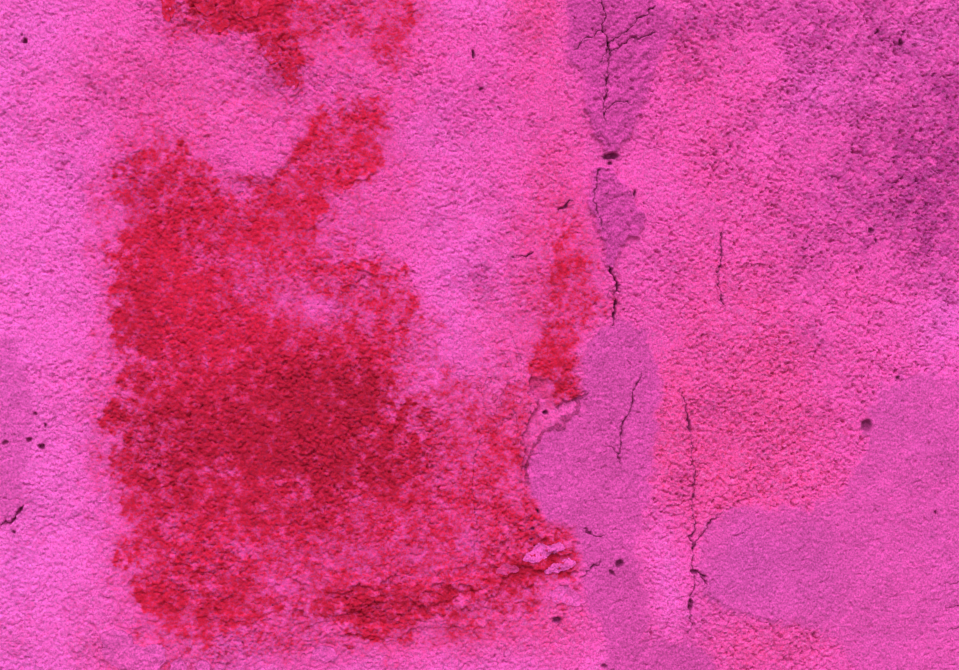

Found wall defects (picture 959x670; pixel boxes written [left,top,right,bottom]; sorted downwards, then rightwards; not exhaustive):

crack [575,0,657,123]
leakage [63,0,624,670]
crack [606,264,622,327]
crack [598,372,643,469]
crack [678,386,725,636]